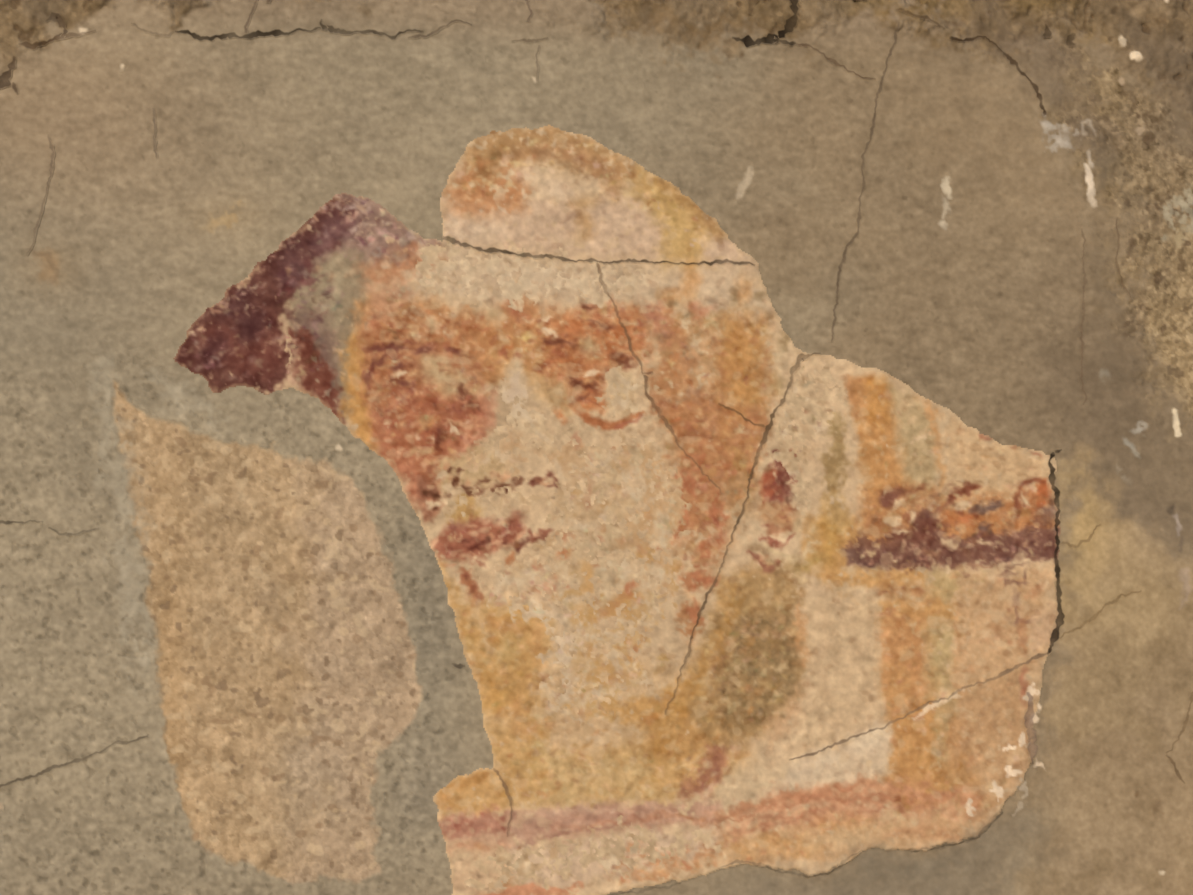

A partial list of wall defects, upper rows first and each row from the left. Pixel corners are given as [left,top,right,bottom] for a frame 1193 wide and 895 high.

crack [151,108,159,158]
crack [441,0,1047,715]
water stain [935,174,954,232]
water stain [939,0,1193,612]
flaking render [1097,67,1193,400]
crack [0,519,99,537]
crack [789,448,1142,761]
crack [1165,691,1193,784]